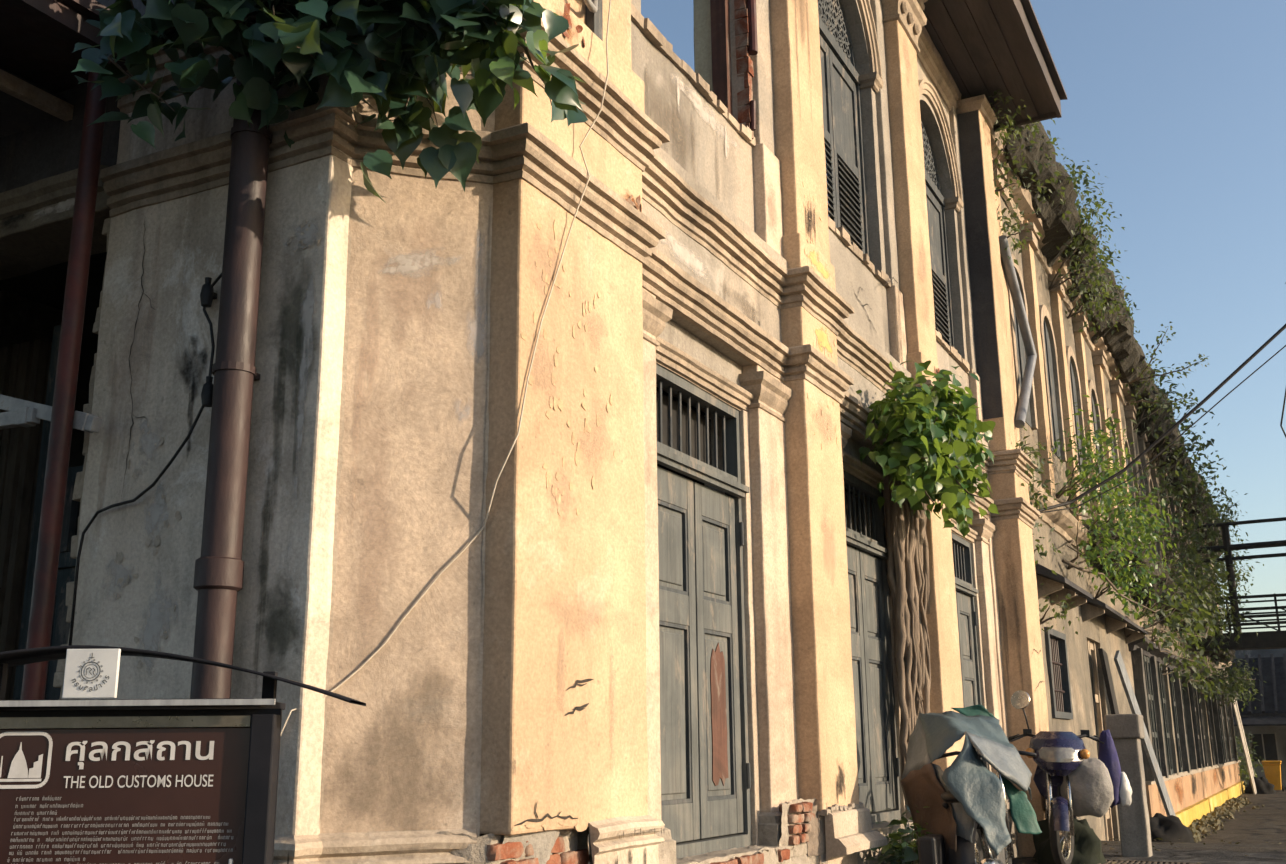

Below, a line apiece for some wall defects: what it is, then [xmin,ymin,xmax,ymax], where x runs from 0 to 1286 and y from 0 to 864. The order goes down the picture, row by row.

crack [121,221,154,496]
water stain [181,340,207,451]
water stain [257,279,315,658]
spalling [437,820,591,864]
spalling [681,798,863,864]